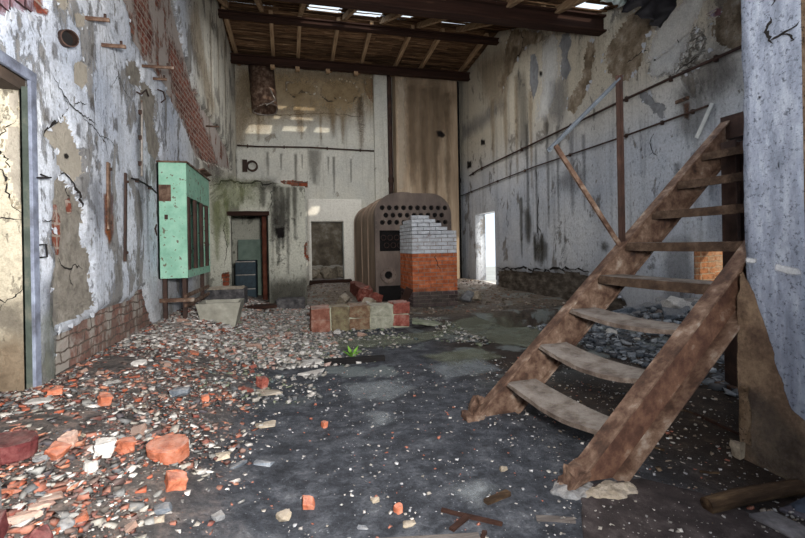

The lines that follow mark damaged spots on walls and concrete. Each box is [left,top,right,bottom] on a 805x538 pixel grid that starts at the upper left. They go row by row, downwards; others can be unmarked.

flaking render [0,0,89,37]
crack [44,78,114,155]
flaking render [123,0,230,171]
spalling [499,28,549,100]
spalling [566,10,652,114]
damp [651,0,701,74]
crack [763,0,799,44]
crack [0,122,22,220]
spalling [43,114,151,376]
damp [214,179,296,229]
damp [520,198,546,261]
damp [273,281,306,305]